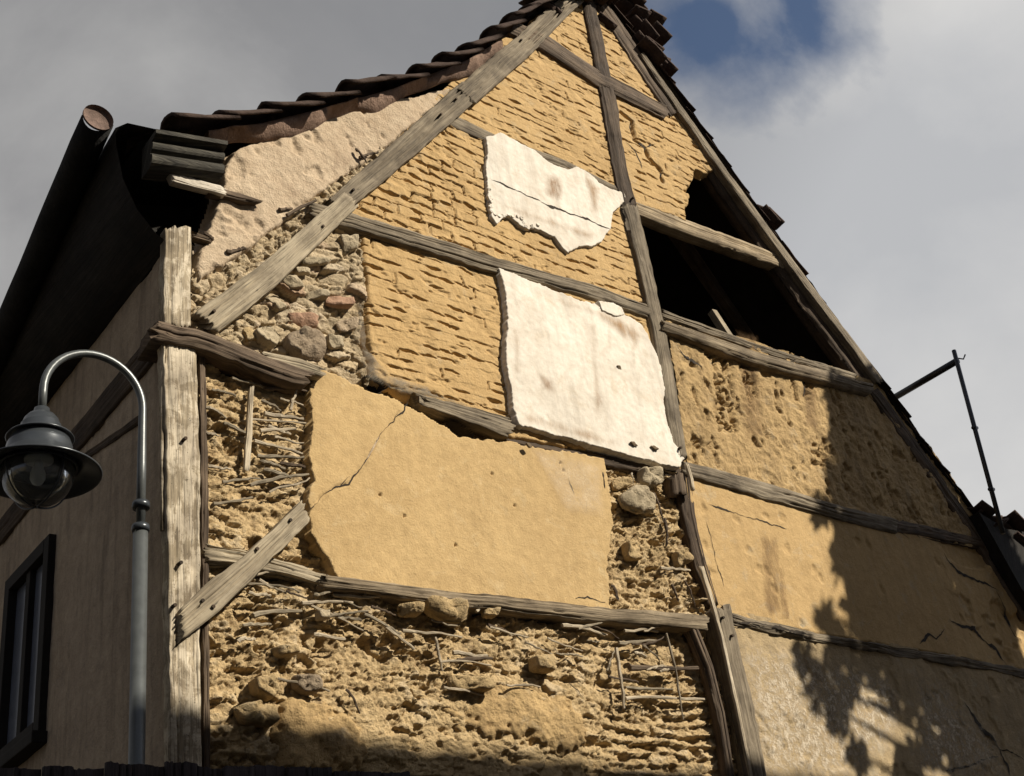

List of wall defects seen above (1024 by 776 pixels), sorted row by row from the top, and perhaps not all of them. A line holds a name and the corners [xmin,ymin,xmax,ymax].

spalling [190,135,400,394]
crack [494,180,610,229]
spalling [196,364,310,552]
crack [310,398,409,509]
flaking render [496,268,708,615]
spalling [208,526,720,776]
crack [707,504,812,635]
crack [920,553,1021,660]